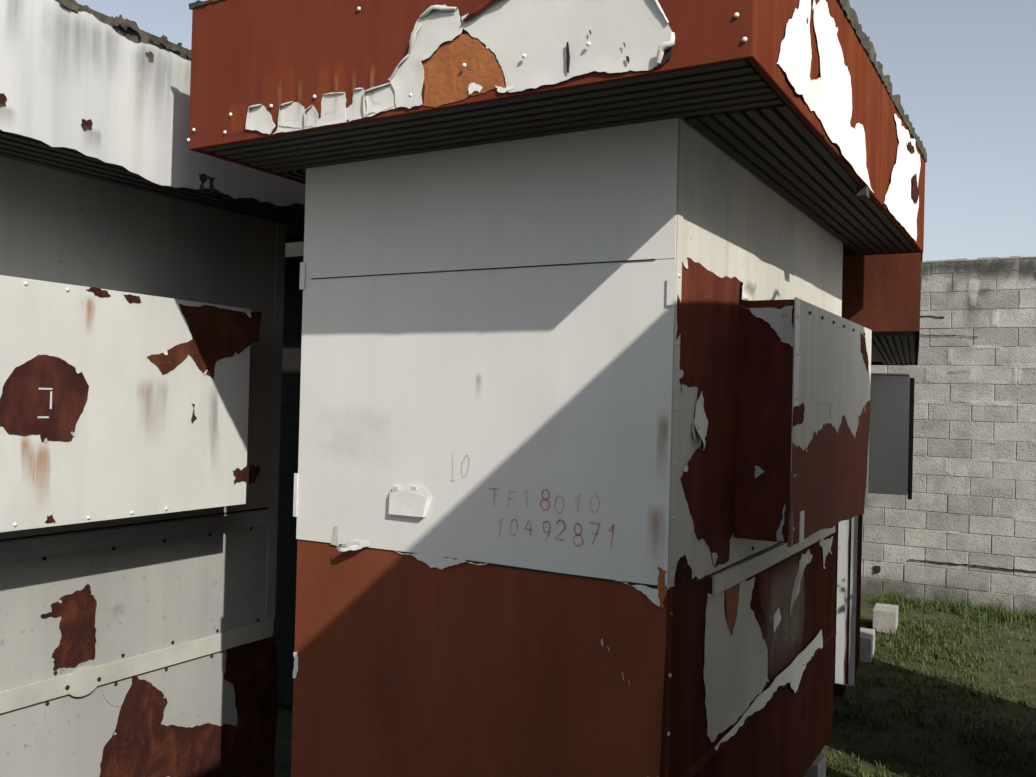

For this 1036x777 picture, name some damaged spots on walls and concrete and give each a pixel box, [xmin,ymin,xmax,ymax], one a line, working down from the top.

peeling [245,0,675,135]
peeling [777,0,921,241]
rust [147,304,262,379]
peeling [741,275,795,347]
rust [0,355,89,465]
rust [41,584,97,671]
peeling [331,526,369,552]
peeling [396,551,487,569]
peeling [616,580,660,606]
peeling [704,536,833,750]
peeling [776,505,786,542]
rust [99,635,278,777]